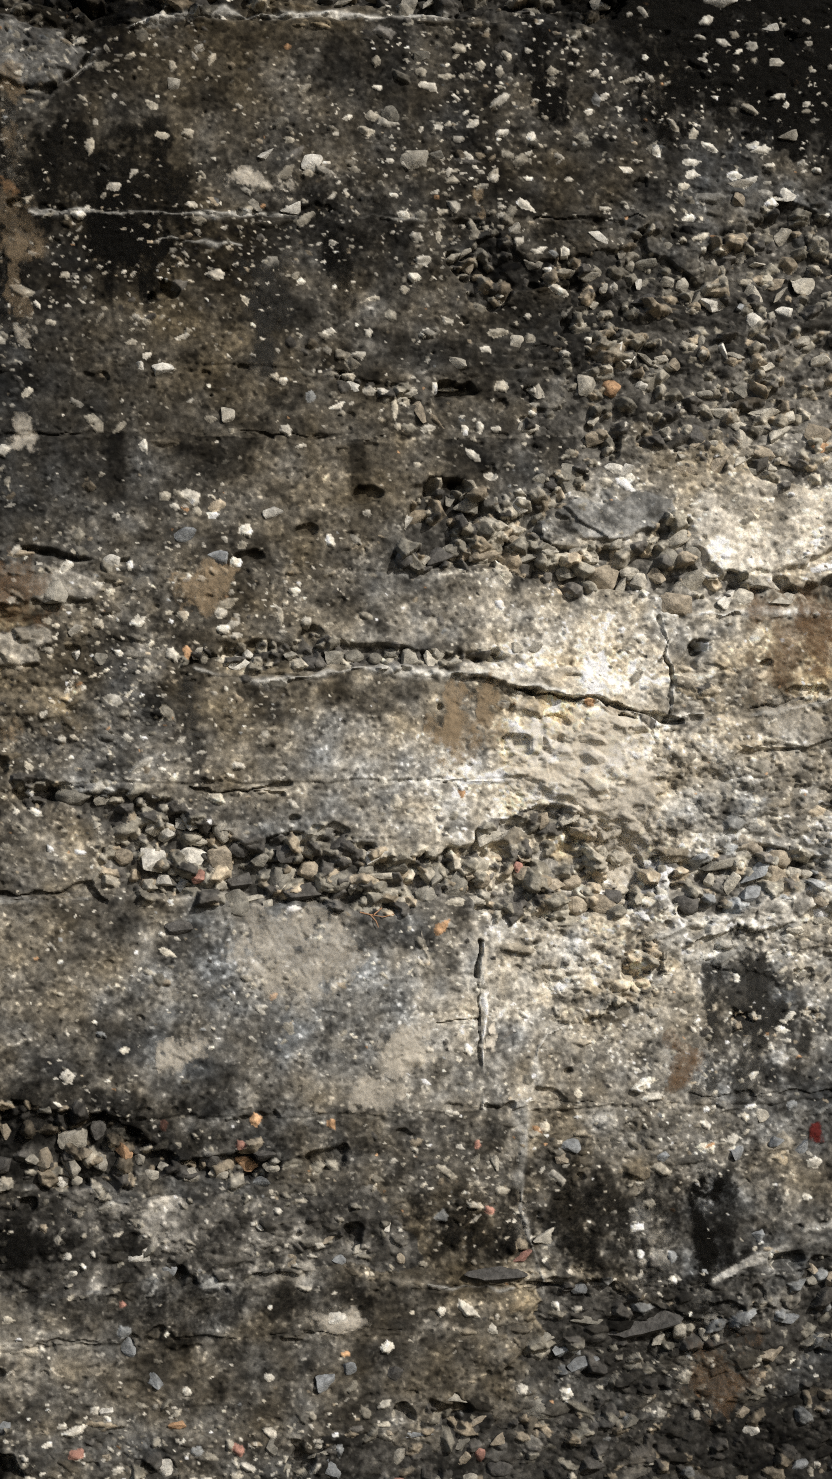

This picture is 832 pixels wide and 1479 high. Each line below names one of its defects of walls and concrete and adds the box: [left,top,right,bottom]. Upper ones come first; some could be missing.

spalling [395,160,832,605]
crack [514,615,685,727]
crack [189,780,294,798]
spalling [11,725,832,945]
spalling [0,1099,426,1302]
spalling [79,1433,192,1479]
spalling [227,1255,832,1479]